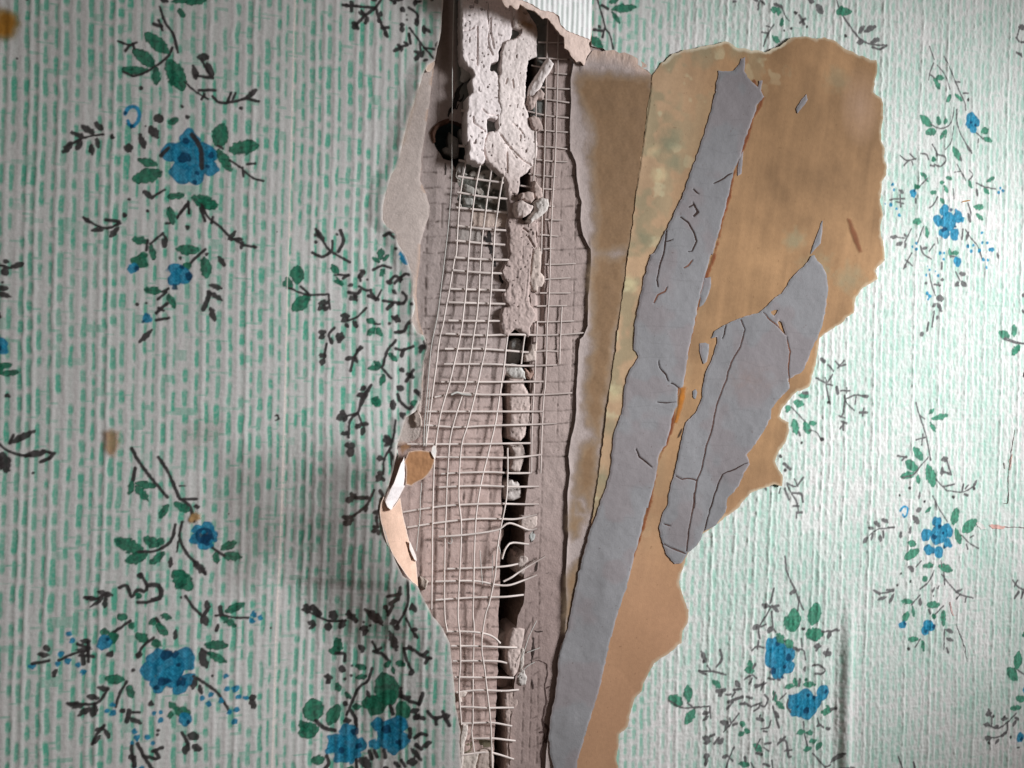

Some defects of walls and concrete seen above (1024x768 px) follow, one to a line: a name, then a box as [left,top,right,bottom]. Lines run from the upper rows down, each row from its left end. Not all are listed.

crack [525,57,538,117]
peeling [383,58,436,335]
spalling [455,162,507,211]
crack [517,169,531,220]
crack [654,173,732,303]
water stain [105,431,118,454]
peeling [544,50,828,768]
crack [664,312,791,554]
crack [497,294,550,768]
spalling [464,739,491,753]
crack [494,714,512,768]